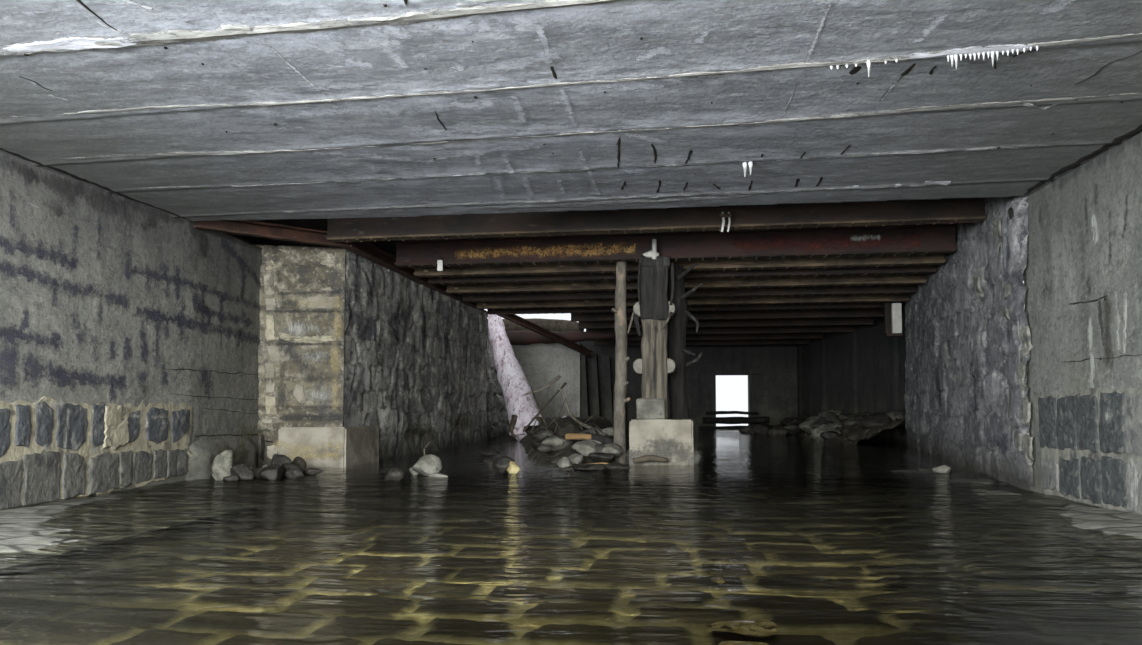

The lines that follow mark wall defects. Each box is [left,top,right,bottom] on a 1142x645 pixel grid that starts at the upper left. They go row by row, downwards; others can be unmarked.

crack [76,0,152,34]
damp [0,0,622,71]
damp [45,14,1142,213]
crack [616,137,626,190]
crack [651,144,720,193]
corrosion [455,242,636,259]
damp [1084,185,1128,263]
damp [1087,278,1127,388]
efflorescence [1128,461,1138,508]